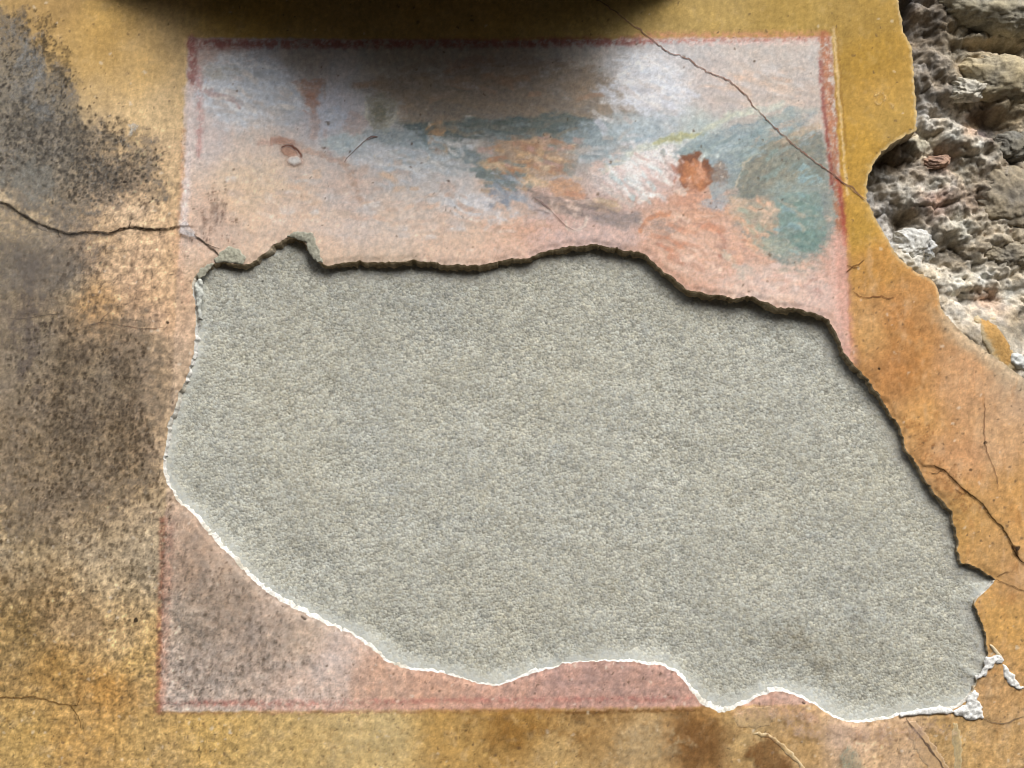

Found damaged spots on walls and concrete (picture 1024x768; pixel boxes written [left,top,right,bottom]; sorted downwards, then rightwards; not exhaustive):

crack [597,0,867,200]
crack [1,202,219,255]
damp [0,10,277,700]
spalling [163,231,1024,768]
crack [925,398,1024,591]